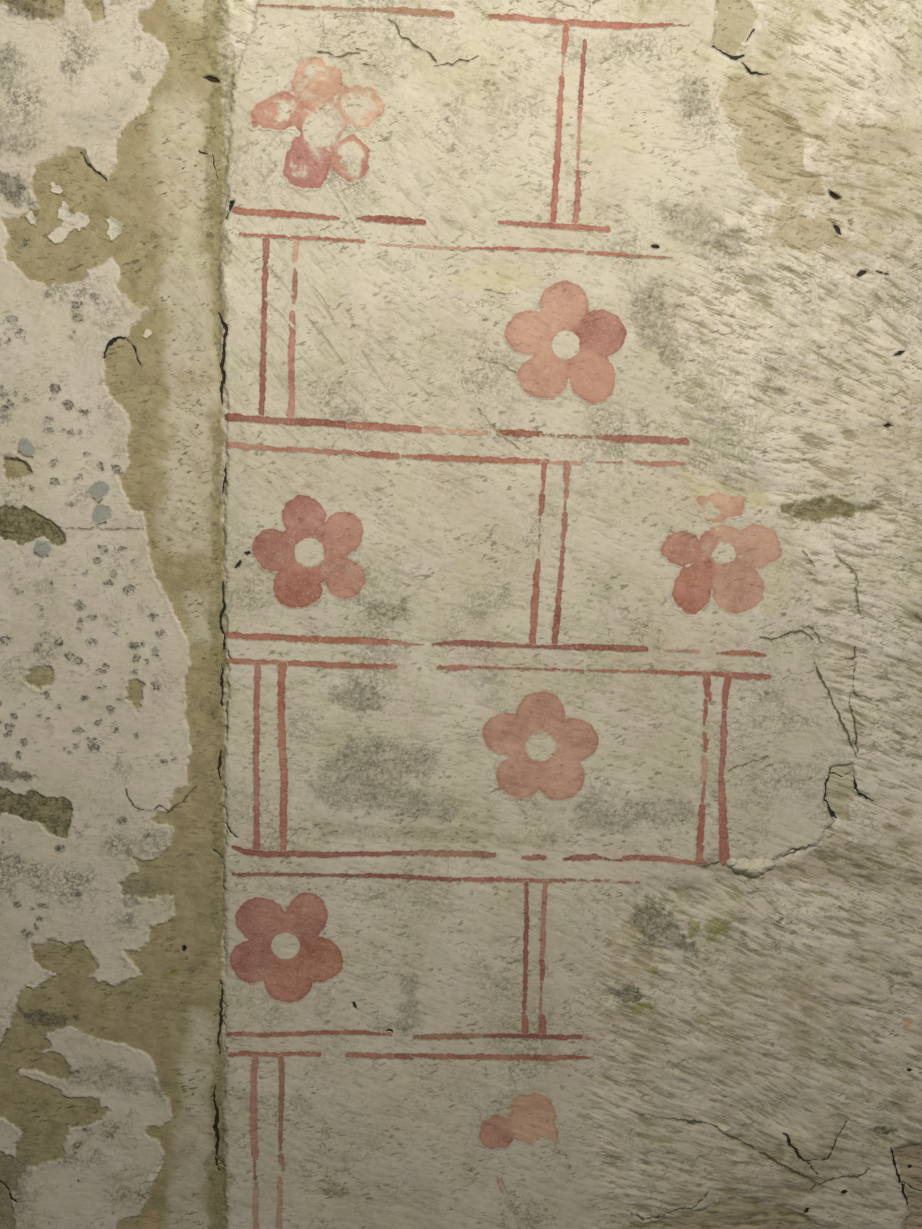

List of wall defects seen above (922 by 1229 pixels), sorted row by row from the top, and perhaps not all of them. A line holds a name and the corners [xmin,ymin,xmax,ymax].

crack [198,149,229,219]
crack [217,311,229,405]
crack [220,463,228,498]
peeling [0,0,226,1229]
crack [218,581,233,707]
crack [759,548,874,859]
crack [213,821,238,859]
crack [696,860,720,868]
crack [216,979,224,1055]
crack [212,1085,227,1172]
crack [627,1189,710,1221]
crack [640,1113,922,1210]